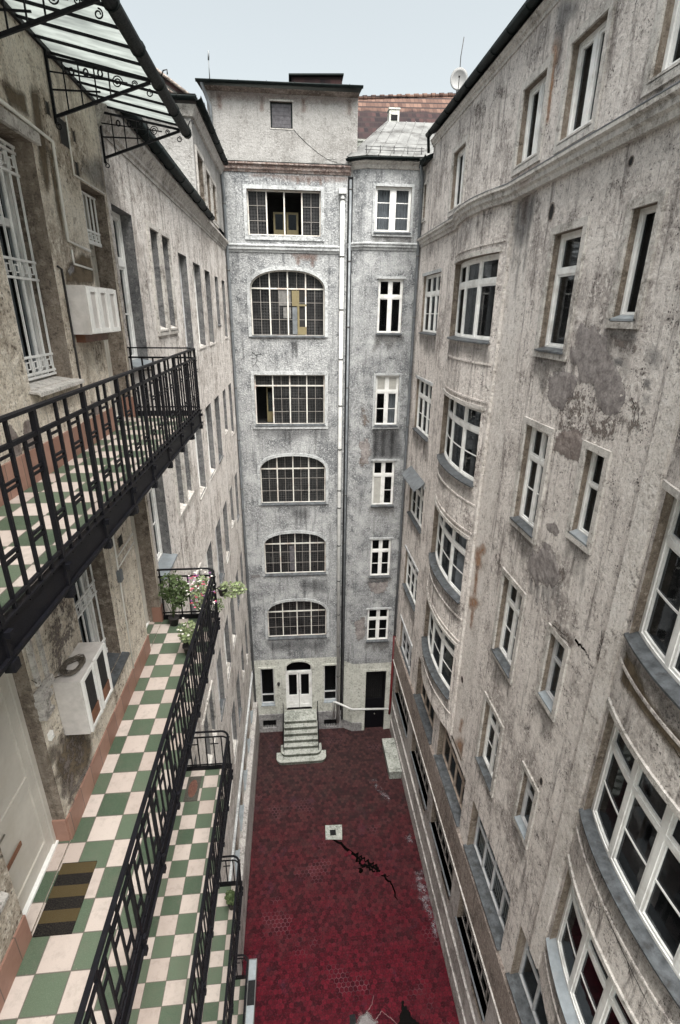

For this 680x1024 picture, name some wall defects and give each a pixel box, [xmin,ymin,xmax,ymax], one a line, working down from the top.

crack [333,840,398,900]